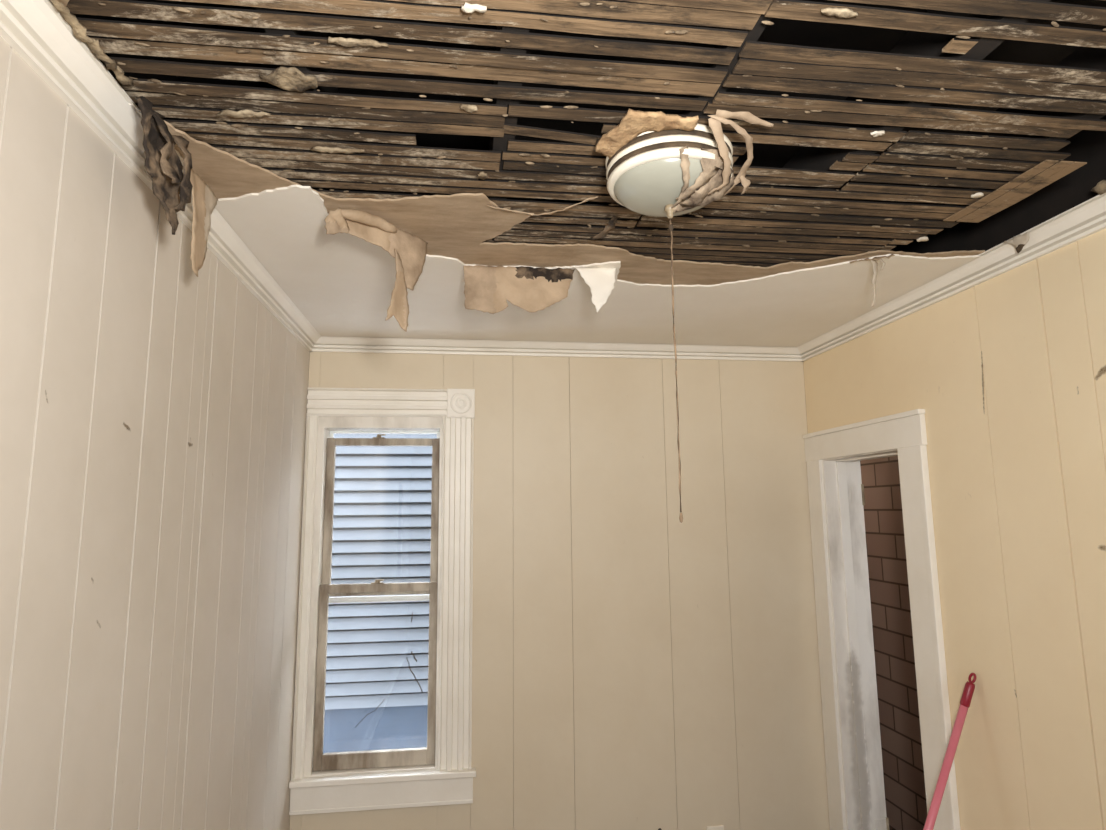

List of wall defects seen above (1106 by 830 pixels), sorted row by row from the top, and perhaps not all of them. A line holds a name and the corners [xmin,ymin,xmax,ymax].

damp [135,96,193,235]
peeling [1003,232,1029,253]
peeling [575,267,616,313]